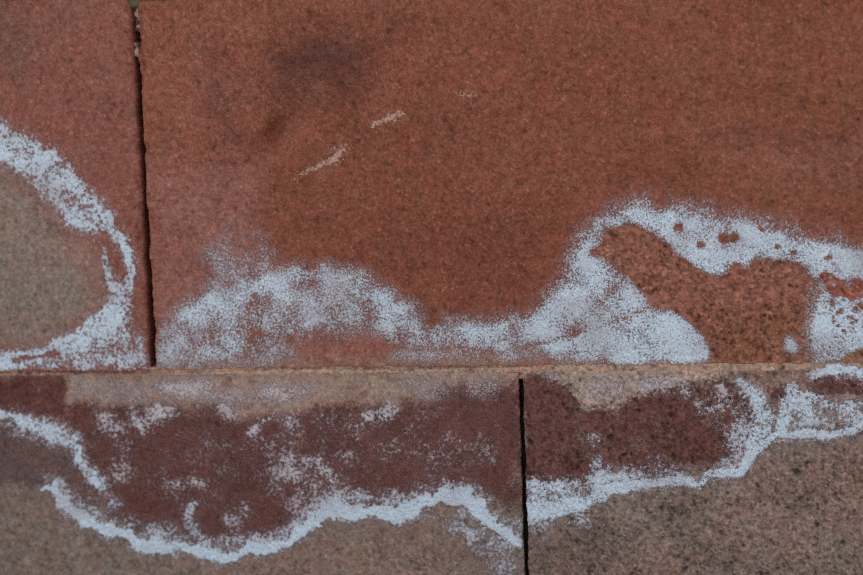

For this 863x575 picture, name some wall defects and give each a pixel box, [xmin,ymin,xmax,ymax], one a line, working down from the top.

water stain [371,111,405,128]
water stain [0,118,863,575]